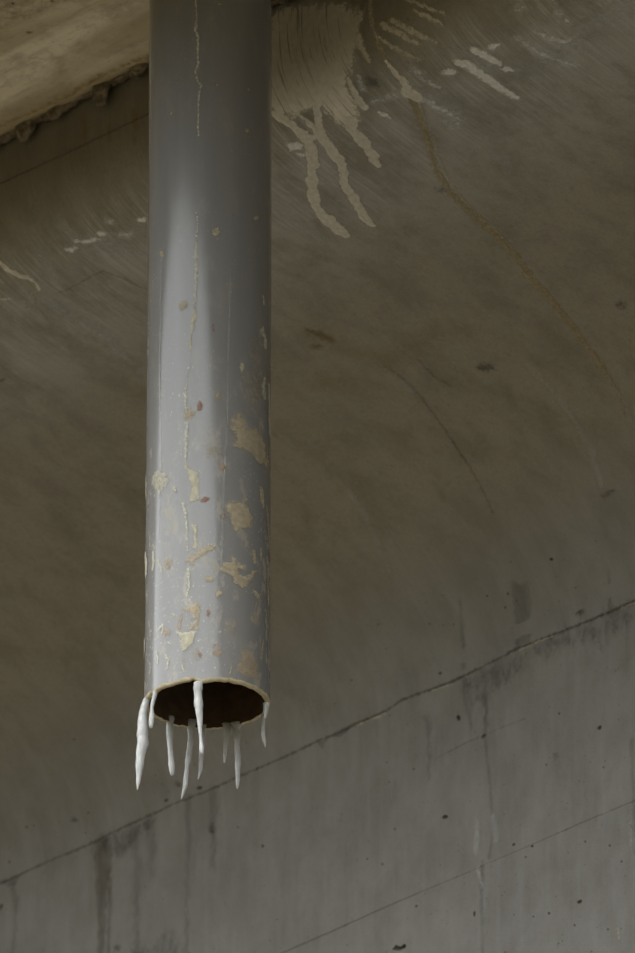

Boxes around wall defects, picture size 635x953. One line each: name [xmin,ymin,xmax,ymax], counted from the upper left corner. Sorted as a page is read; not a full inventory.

leakage [0,260,47,320]
leakage [368,0,625,413]